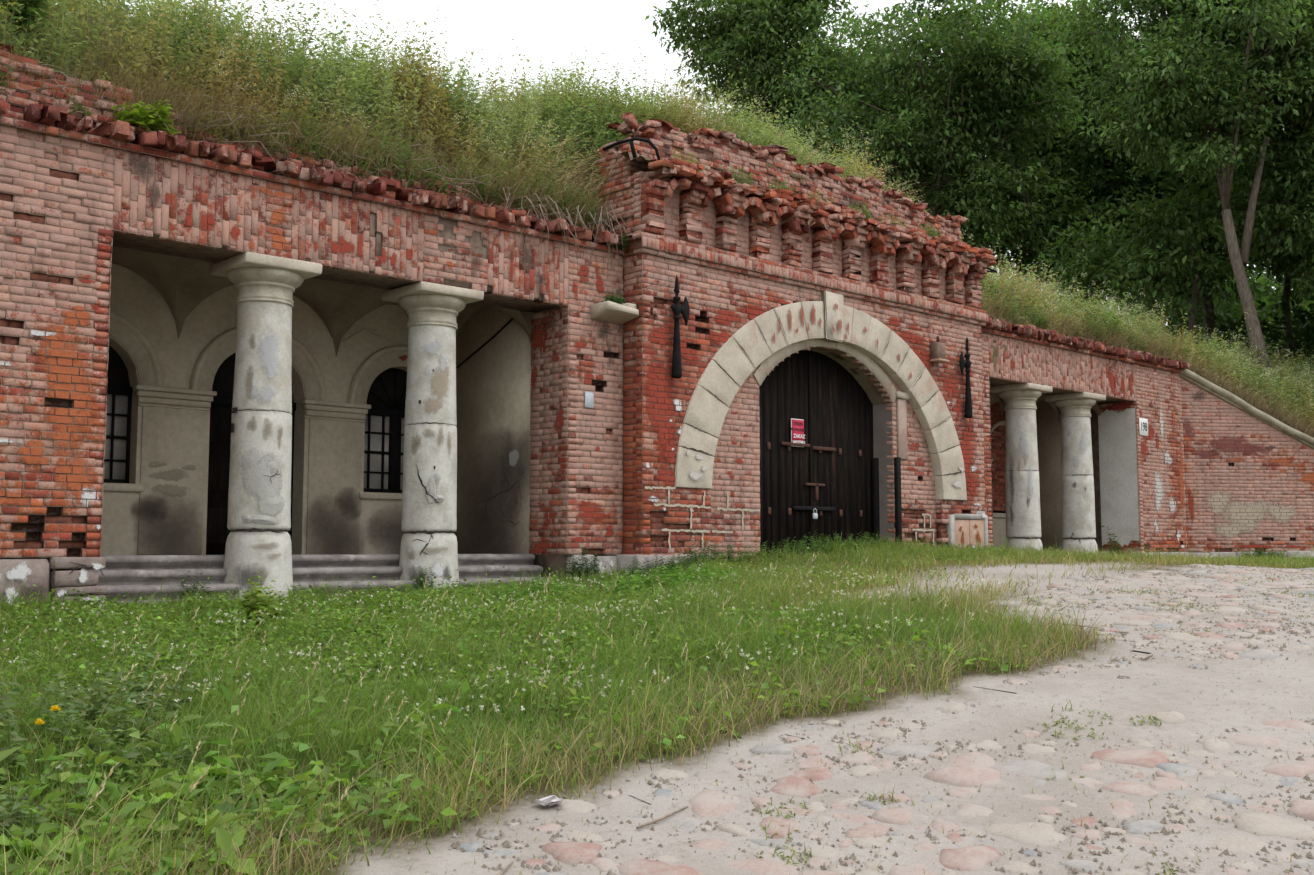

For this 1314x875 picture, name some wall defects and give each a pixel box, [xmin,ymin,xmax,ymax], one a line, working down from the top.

spalling [30,273,97,285]
peeling [0,298,104,605]
water stain [136,503,189,555]
water stain [313,494,357,554]
crack [402,465,457,555]